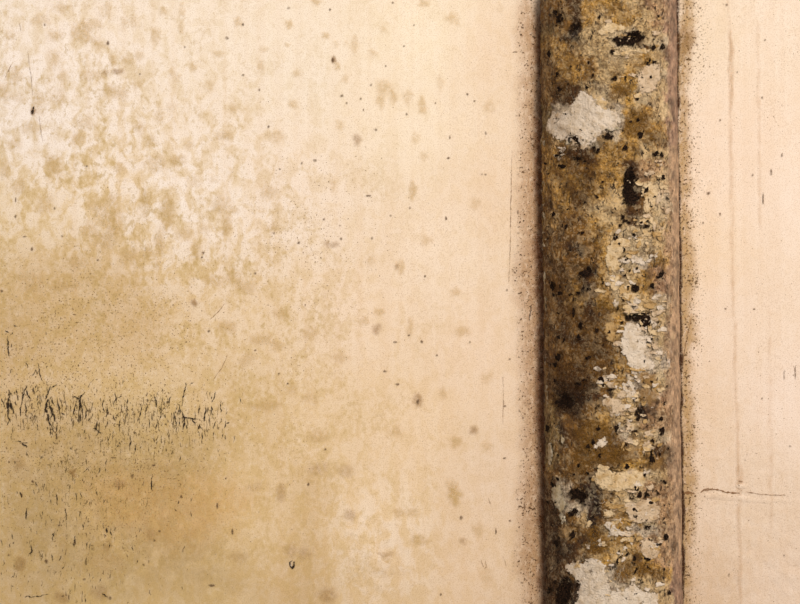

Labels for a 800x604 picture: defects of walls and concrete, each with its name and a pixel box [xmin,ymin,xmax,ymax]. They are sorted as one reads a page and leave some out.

water stain [514,0,543,188]
peeling [546,71,640,168]
water stain [677,0,698,548]
water stain [509,186,547,604]
corrosion [584,526,608,553]
corrosion [573,421,624,474]
peeling [546,151,671,604]
crack [685,481,767,496]